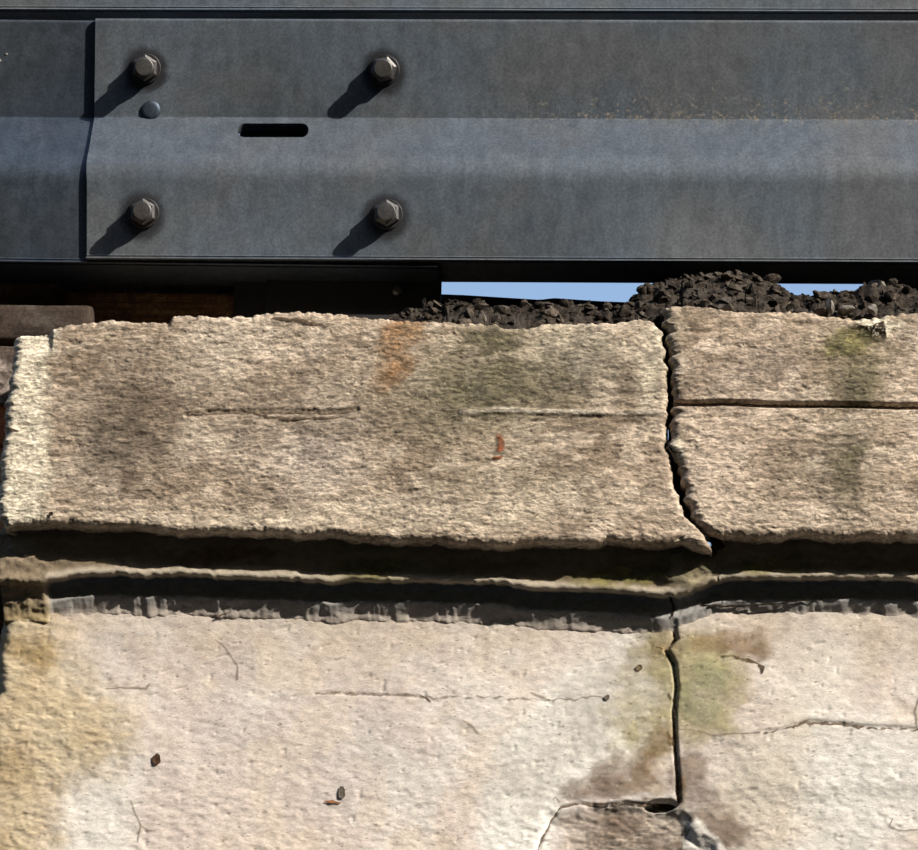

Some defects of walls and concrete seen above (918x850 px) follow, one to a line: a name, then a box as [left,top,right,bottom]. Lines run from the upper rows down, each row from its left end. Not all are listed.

leakage [850,315,904,340]
leakage [843,359,876,405]
crack [659,313,918,518]
crack [709,537,725,551]
crack [722,654,765,674]
leakage [625,634,768,754]
crack [537,595,680,850]
crack [764,720,918,733]
leakage [676,754,705,790]
leakage [673,806,744,850]